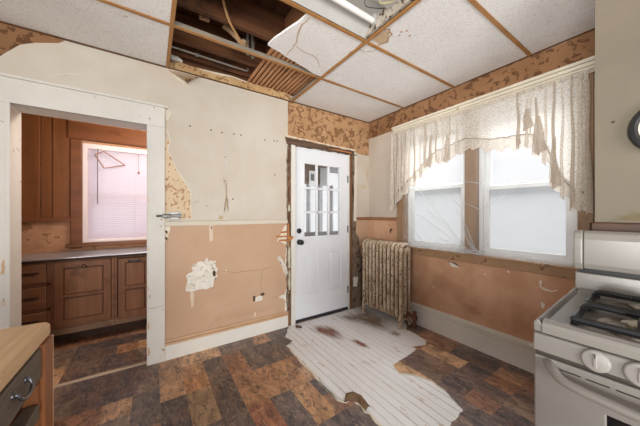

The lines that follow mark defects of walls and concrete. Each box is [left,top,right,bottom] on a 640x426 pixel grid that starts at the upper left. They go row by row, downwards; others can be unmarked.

leakage [359,29,411,52]
peeling [166,68,201,84]
spalling [276,145,294,311]
spalling [186,258,218,308]